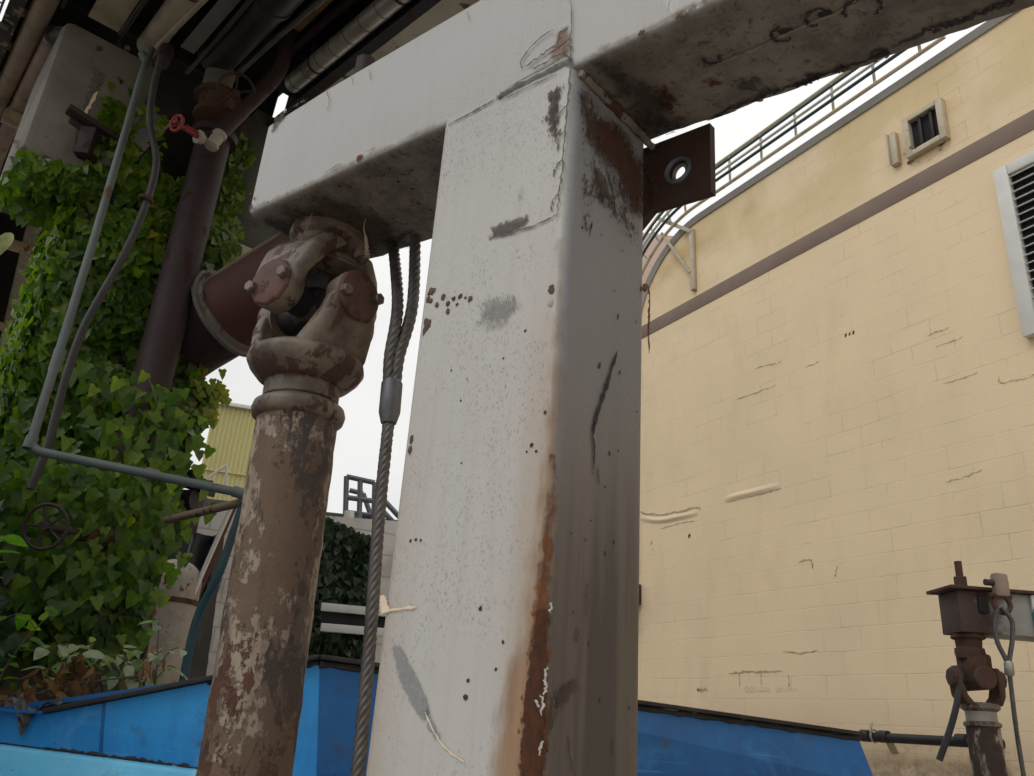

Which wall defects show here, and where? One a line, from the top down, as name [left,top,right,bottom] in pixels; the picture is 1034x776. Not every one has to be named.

crack [448,2,573,212]
crack [707,0,1015,121]
crack [944,372,1034,384]
crack [640,507,700,529]
corrosion [498,494,555,776]
crack [730,650,818,693]